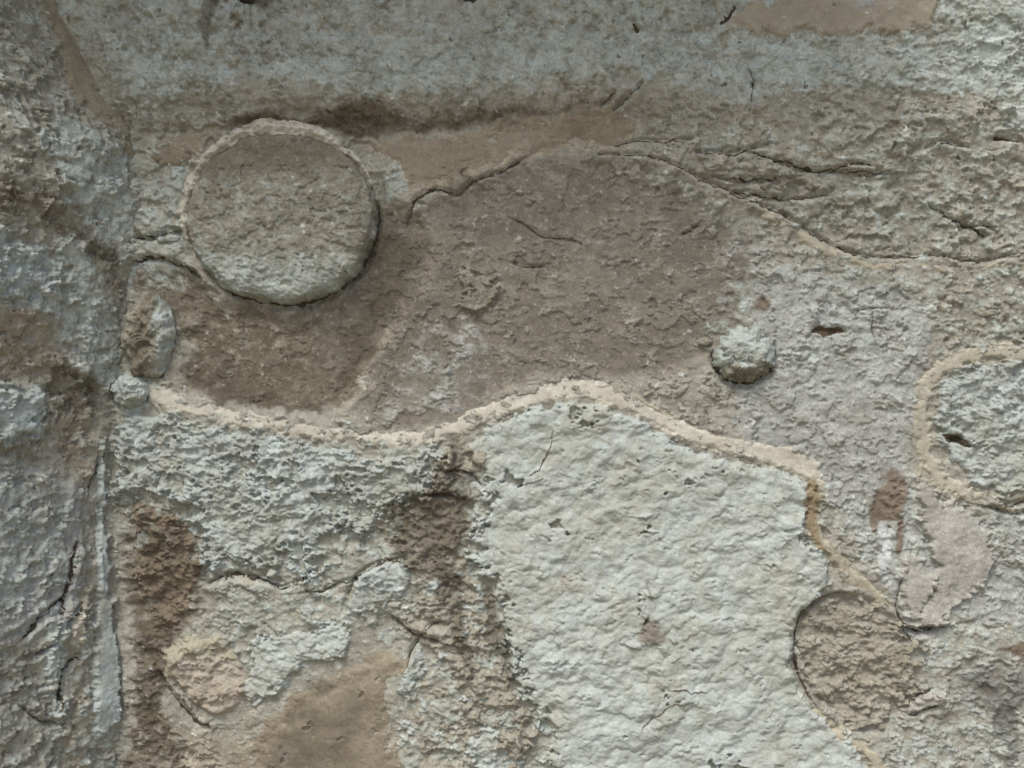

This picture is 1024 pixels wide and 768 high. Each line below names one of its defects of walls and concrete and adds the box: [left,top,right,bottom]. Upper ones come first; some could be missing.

crack [410,162,519,217]
peeling [701,151,834,194]
crack [600,138,1020,263]
crack [522,222,579,242]
peeling [451,264,501,314]
peeling [696,335,769,370]
spalling [811,325,845,337]
peeling [933,360,1024,494]
crack [211,559,407,608]
peeling [44,399,996,768]
crack [23,544,83,724]
crack [398,620,441,666]